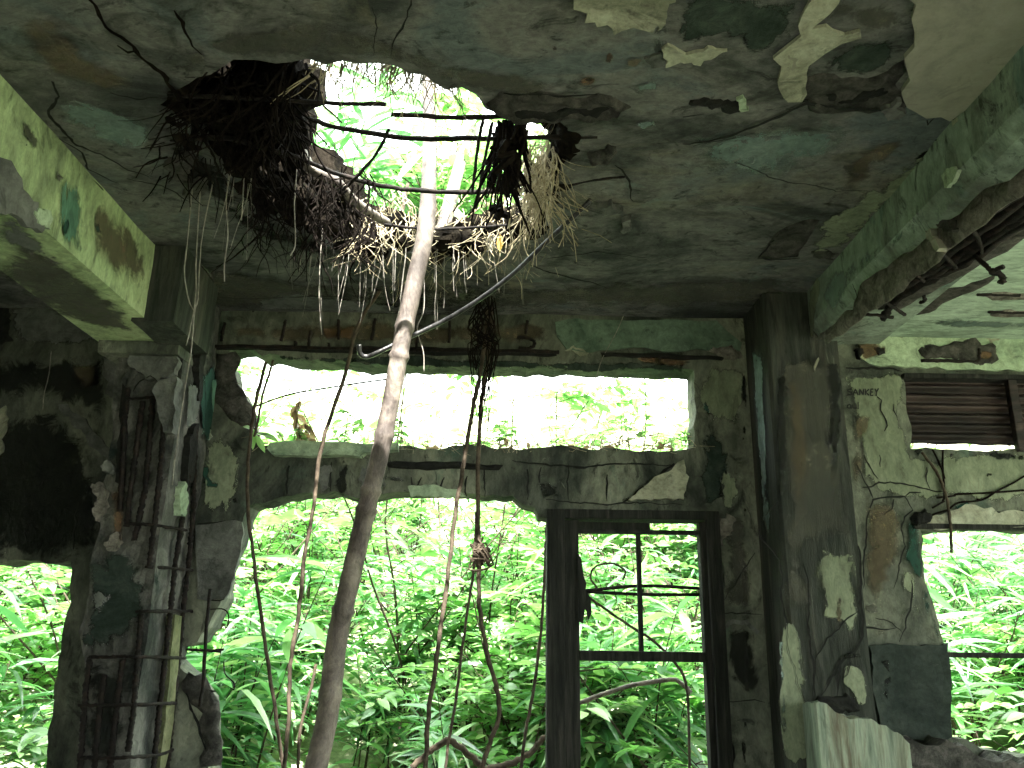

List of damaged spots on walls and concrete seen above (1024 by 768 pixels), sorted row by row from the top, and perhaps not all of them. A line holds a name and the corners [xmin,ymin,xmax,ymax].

crack [47,81,210,207]
crack [88,0,223,176]
spalling [163,91,631,252]
flaking render [574,0,676,35]
flaking render [773,0,1024,121]
leakage [95,208,144,285]
spalling [817,166,1024,343]
flaking render [58,293,400,768]
flaking render [408,484,466,499]
spalling [623,460,689,502]
peeling [818,550,902,632]
crack [802,396,943,701]